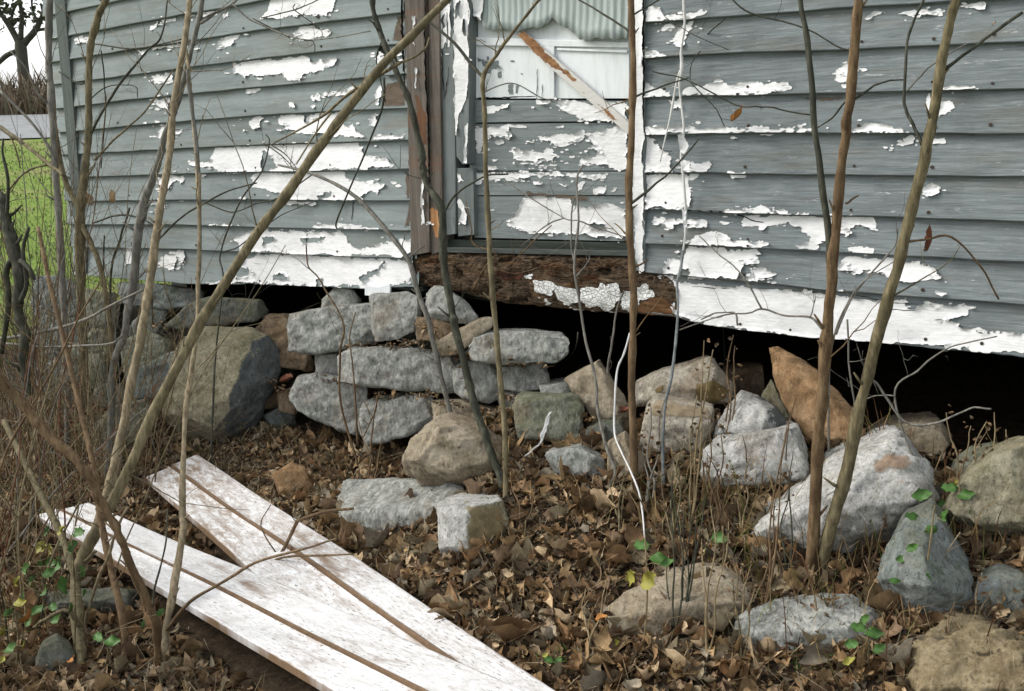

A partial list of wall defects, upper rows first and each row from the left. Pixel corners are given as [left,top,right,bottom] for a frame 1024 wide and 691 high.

peeling [212,0,338,94]
peeling [149,85,405,212]
peeling [440,0,1024,355]
peeling [205,218,413,288]
crack [524,274,655,313]